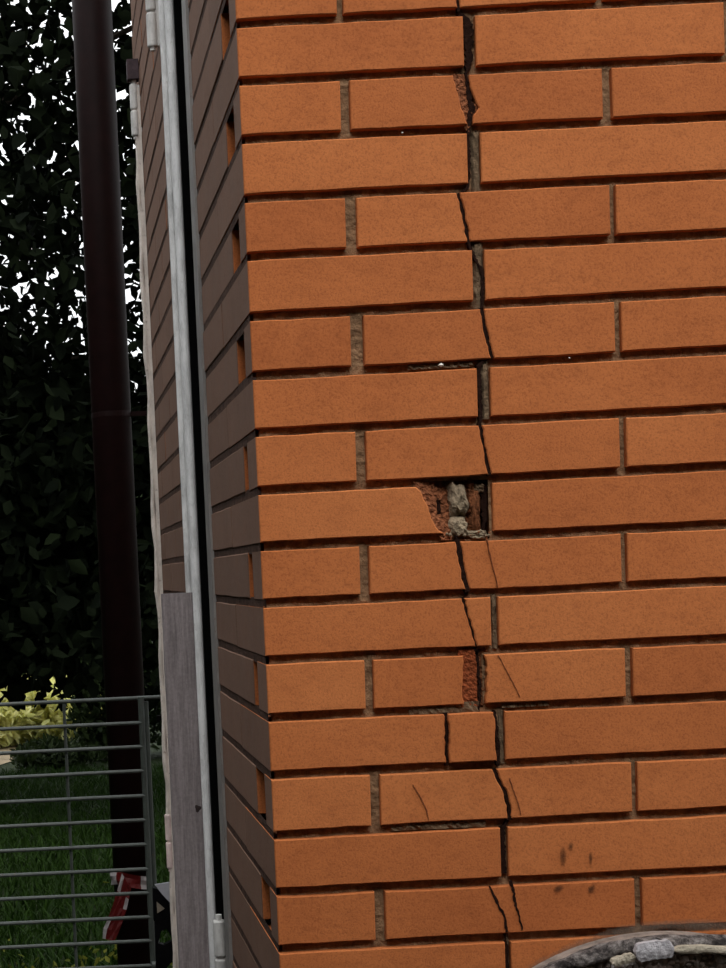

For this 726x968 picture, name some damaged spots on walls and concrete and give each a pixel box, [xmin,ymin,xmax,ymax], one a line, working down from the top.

crack [455,0,494,476]
spalling [414,480,490,540]
spalling [458,649,487,712]
crack [452,535,520,696]
crack [489,710,523,968]